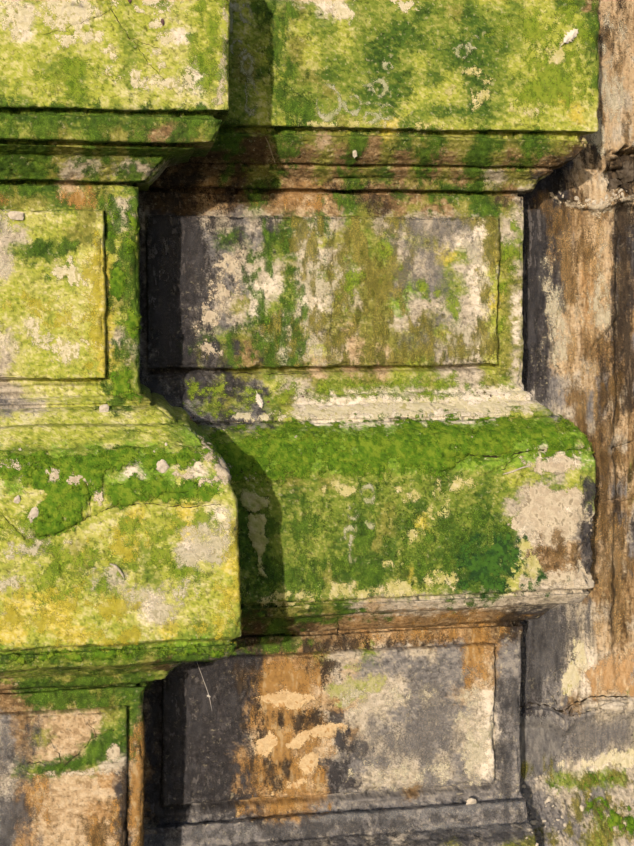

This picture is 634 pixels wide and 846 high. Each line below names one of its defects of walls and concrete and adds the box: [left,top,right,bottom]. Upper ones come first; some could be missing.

crack [47,6,179,97]
leakage [0,0,634,453]
crack [71,497,220,527]
leakage [608,473,625,551]
leakage [134,595,593,846]
leakage [0,723,40,846]
leakage [78,766,128,846]